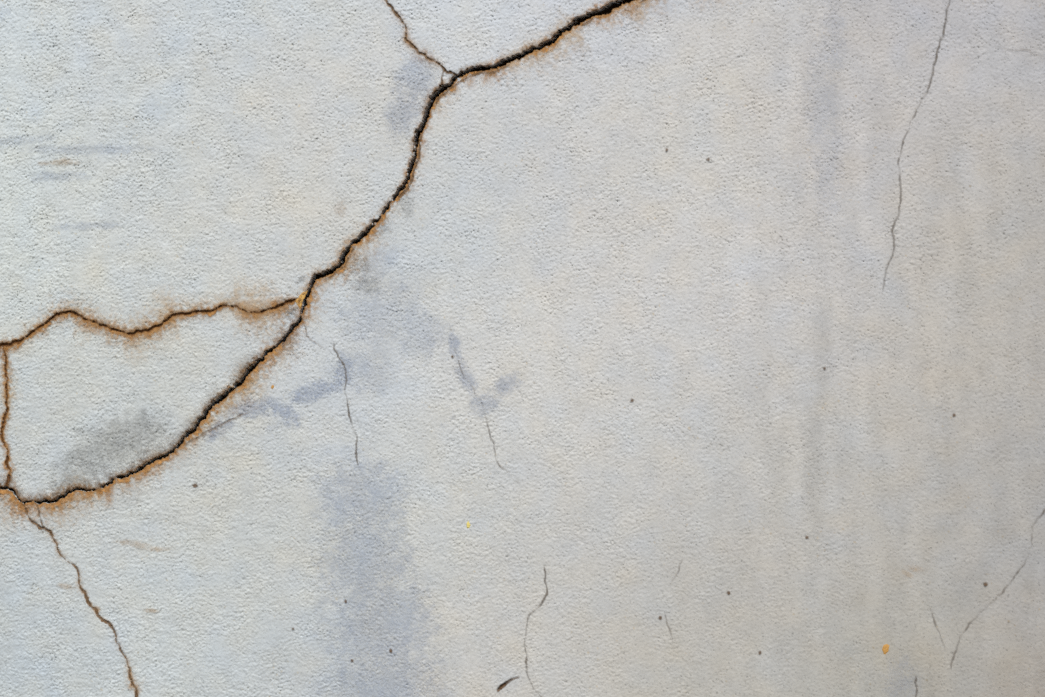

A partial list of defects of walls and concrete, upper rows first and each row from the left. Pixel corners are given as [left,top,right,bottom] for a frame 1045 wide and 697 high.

crack [0,0,646,697]
corrosion [0,0,647,511]
crack [928,11,947,89]